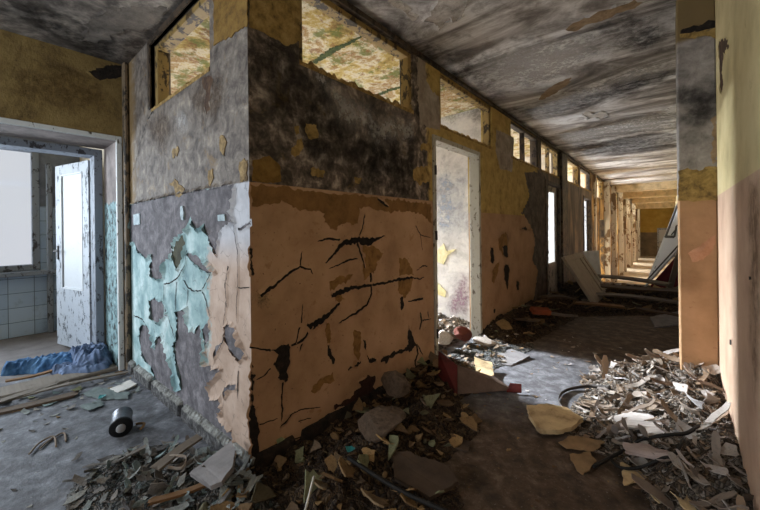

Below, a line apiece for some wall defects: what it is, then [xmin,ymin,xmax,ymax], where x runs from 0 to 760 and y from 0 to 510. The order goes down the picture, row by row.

spalling [86,63,122,82]
peeling [563,0,647,33]
spalling [678,18,716,35]
peeling [128,179,252,283]
spalling [247,246,256,278]
crack [133,212,431,367]
peeling [248,182,432,232]
peeling [299,56,559,311]
peeling [138,296,262,458]
crack [249,343,320,439]